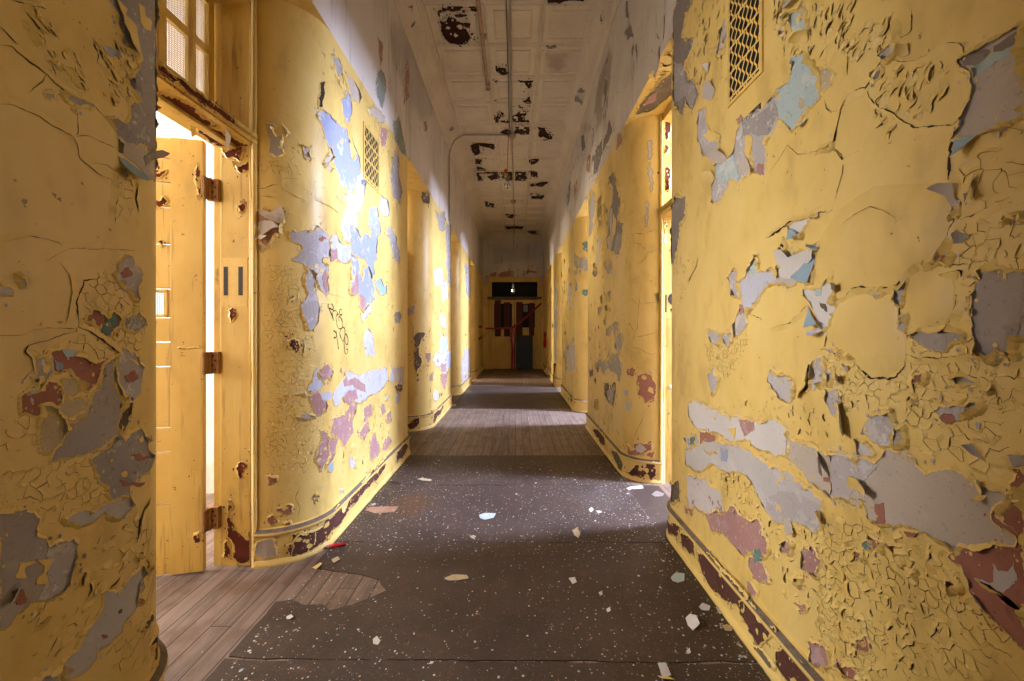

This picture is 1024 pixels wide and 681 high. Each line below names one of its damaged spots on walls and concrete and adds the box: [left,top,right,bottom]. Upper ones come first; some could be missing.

crack [0,457,106,524]
crack [0,20,142,223]
spalling [0,254,156,631]
peeling [21,0,251,182]
peeling [220,36,482,566]
peeling [437,3,478,48]
peeling [470,63,554,200]
spalling [483,121,1024,681]
peeling [633,0,1024,306]
crack [766,4,1024,479]
peeling [30,543,160,681]
crack [814,509,1019,681]